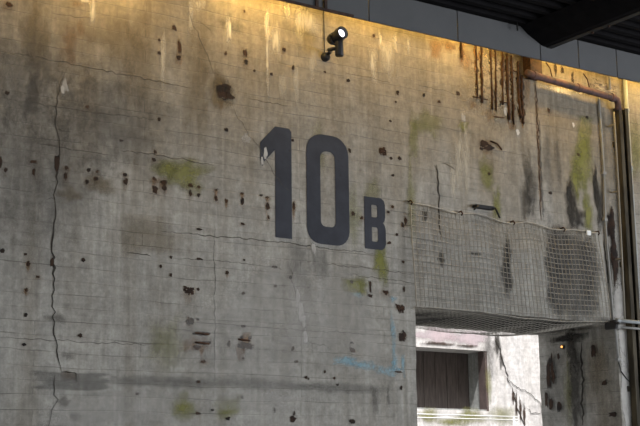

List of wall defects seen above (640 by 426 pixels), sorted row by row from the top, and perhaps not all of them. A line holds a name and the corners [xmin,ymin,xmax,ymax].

spalling [213,78,235,105]
spalling [472,46,526,135]
crack [435,163,454,240]
water stain [566,168,602,228]
crack [47,67,77,423]
water stain [502,240,512,292]
crack [495,336,541,426]